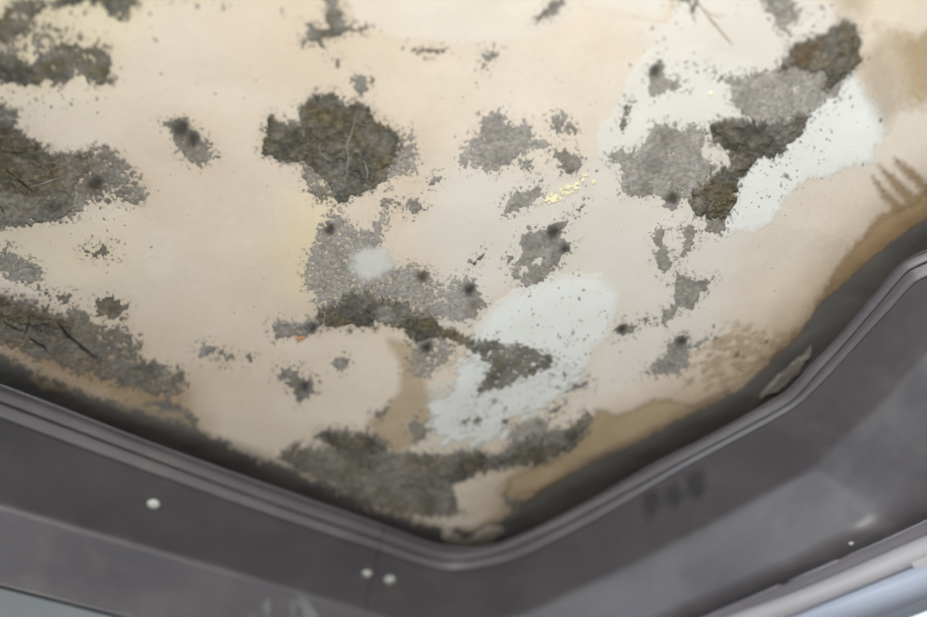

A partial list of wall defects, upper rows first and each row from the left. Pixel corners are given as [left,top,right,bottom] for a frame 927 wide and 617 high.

damp [0,0,199,126]
damp [386,129,423,179]
damp [454,107,586,217]
damp [620,98,637,131]
damp [608,119,717,211]
damp [643,48,851,127]
damp [759,0,833,37]
damp [0,141,226,441]
damp [196,342,234,368]
damp [446,137,927,533]